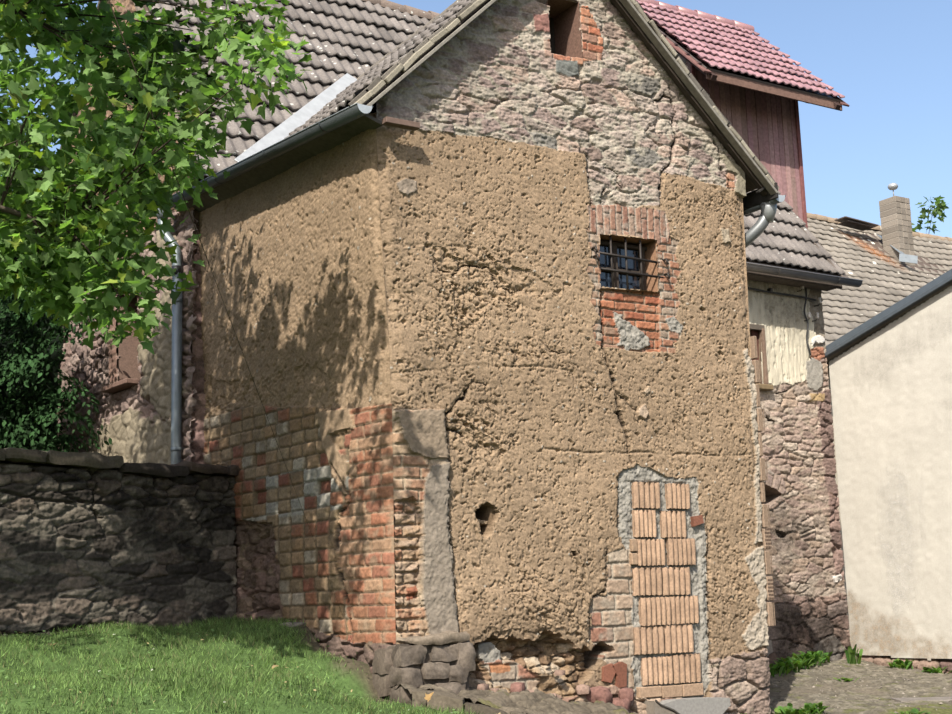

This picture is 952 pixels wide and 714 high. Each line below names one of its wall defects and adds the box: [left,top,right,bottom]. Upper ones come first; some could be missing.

flaking render [397,178,417,195]
crack [585,155,624,206]
crack [645,87,678,207]
peeling [722,154,746,196]
peeling [393,408,507,638]
crack [444,380,487,627]
spalling [470,630,615,697]